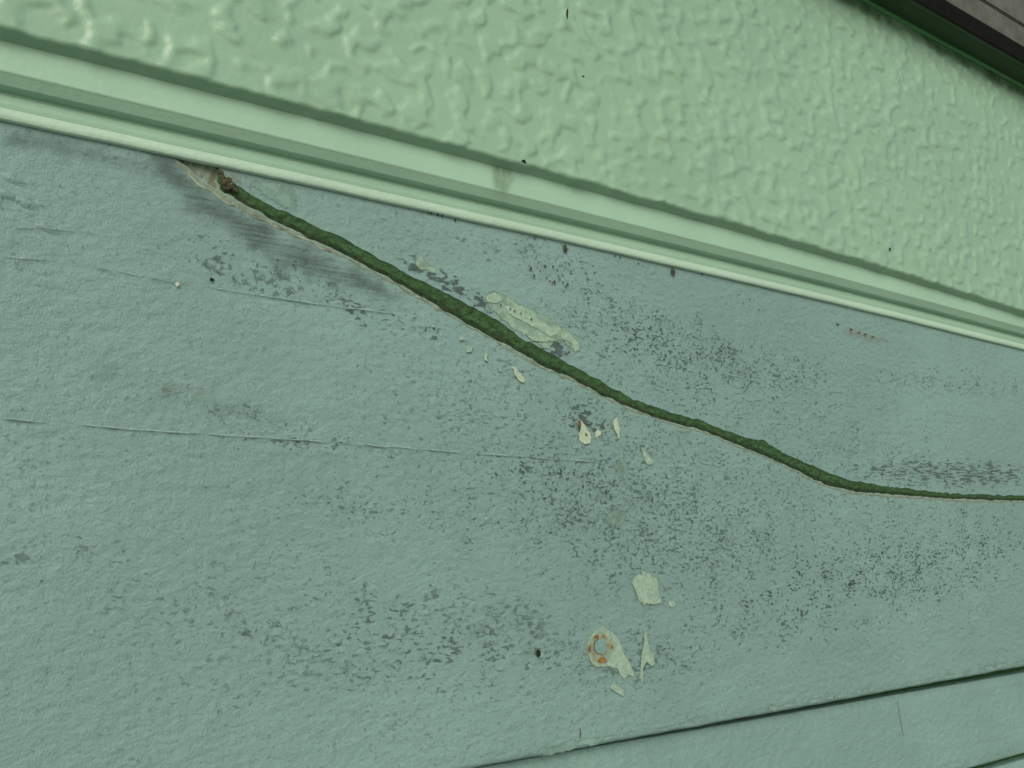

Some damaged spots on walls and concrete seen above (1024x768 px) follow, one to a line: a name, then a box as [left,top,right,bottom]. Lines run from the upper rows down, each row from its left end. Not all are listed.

peeling [403,255,580,357]
crack [176,159,1024,503]
crack [80,424,596,462]
peeling [565,404,620,444]
peeling [632,571,676,607]
peeling [587,626,656,696]